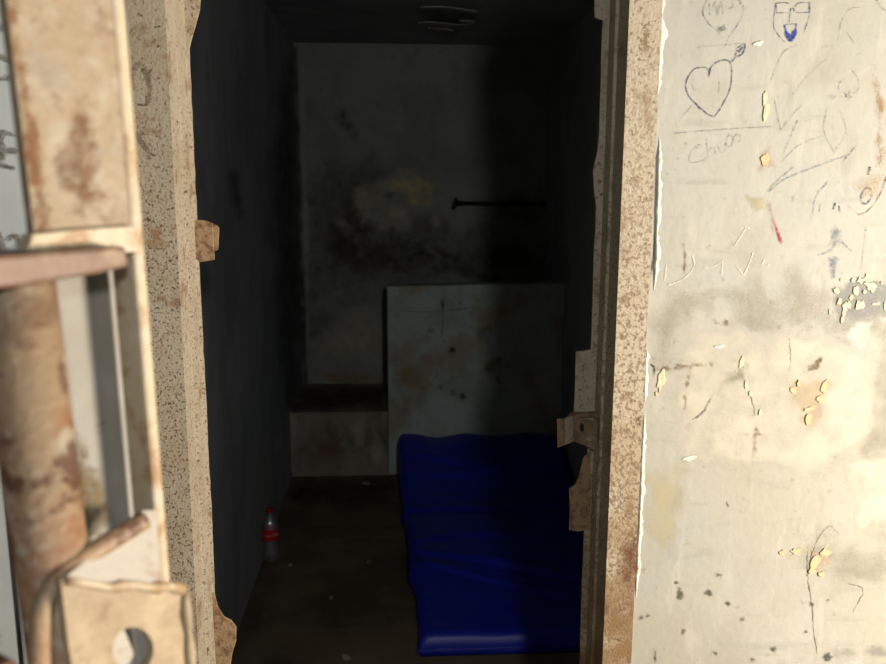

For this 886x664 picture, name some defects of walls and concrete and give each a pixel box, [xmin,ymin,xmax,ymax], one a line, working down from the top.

corrosion [6,0,111,233]
peeling [829,273,886,324]
flaking render [787,378,834,428]
corrosion [617,534,641,582]
flaking render [779,546,834,577]
crack [806,527,839,651]